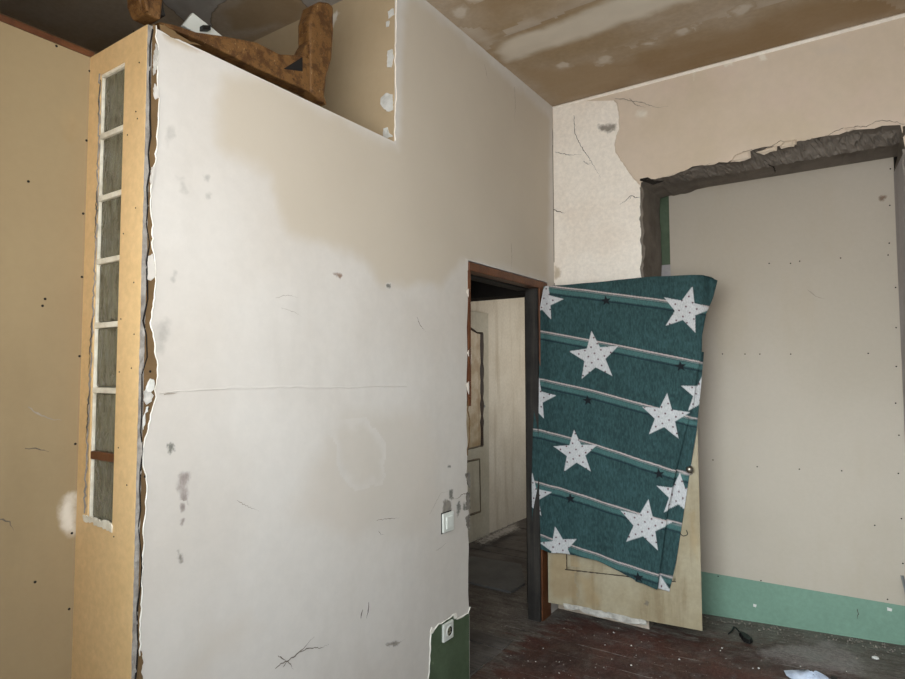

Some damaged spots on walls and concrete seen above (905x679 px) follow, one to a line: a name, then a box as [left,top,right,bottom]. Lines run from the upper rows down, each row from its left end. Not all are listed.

peeling [163,0,342,36]
water stain [201,0,905,299]
peeling [553,100,663,285]
peeling [147,254,156,281]
peeling [143,379,155,429]
crack [275,637,329,669]
peeling [428,607,470,679]